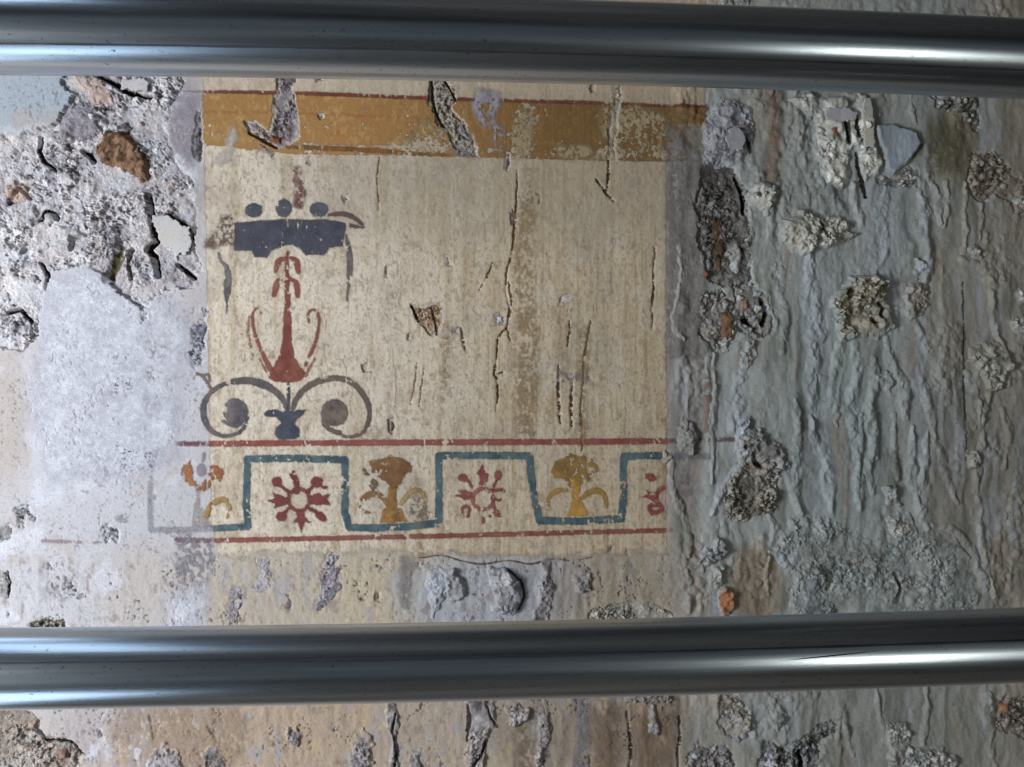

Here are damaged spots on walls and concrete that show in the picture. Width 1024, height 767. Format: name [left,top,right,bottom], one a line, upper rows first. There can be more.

spalling [245,78,299,158]
spalling [404,81,477,156]
spalling [0,76,203,352]
crack [595,160,614,202]
spalling [965,149,1024,218]
spalling [411,303,443,336]
crack [478,171,518,404]
crack [556,320,591,451]
spalling [694,162,773,353]
water stain [661,92,1024,616]
spalling [722,460,781,522]
spalling [0,710,83,767]